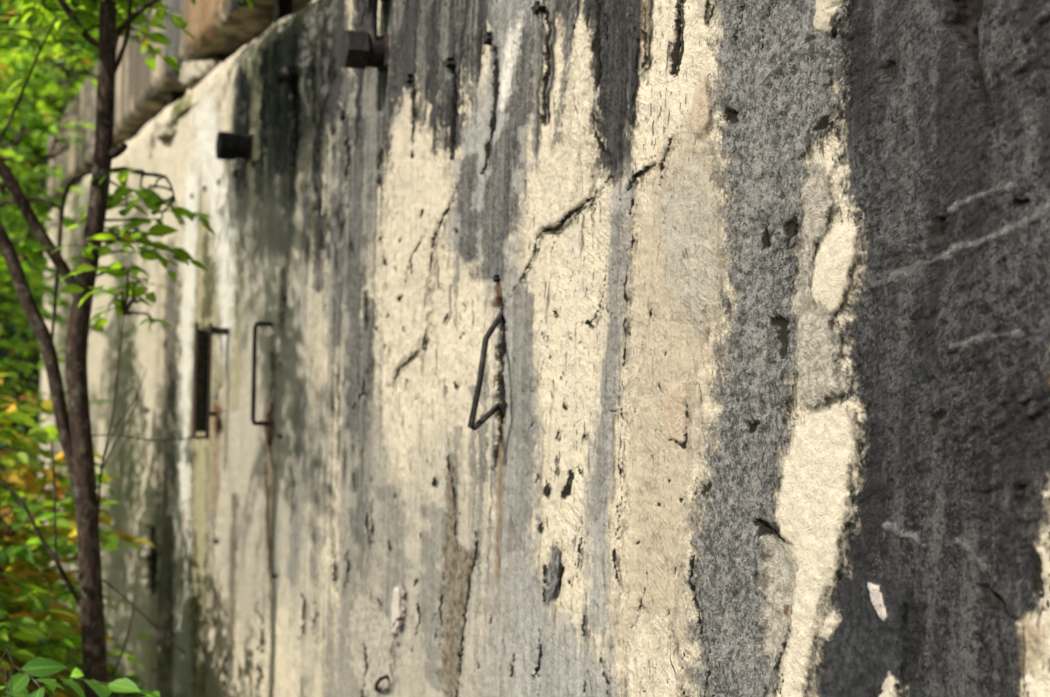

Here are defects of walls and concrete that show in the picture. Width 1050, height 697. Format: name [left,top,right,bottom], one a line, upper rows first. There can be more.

water stain [87,0,723,697]
crack [506,110,678,628]
water stain [805,570,911,697]
water stain [1006,626,1025,697]